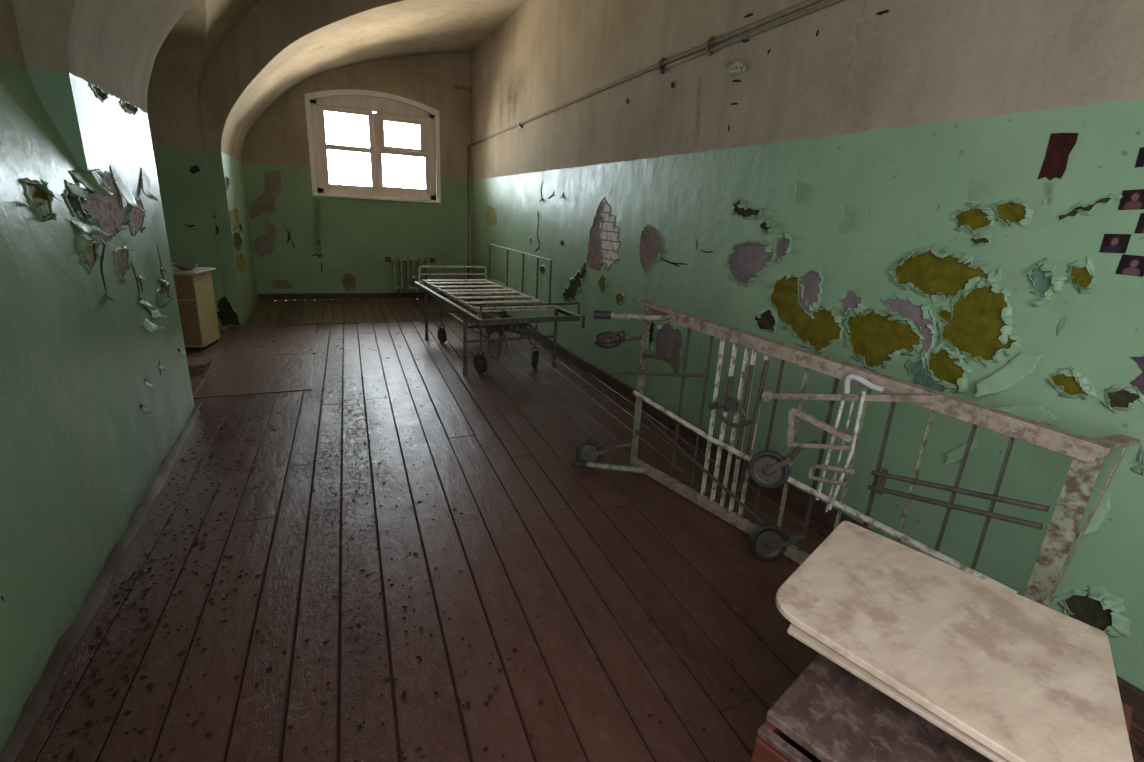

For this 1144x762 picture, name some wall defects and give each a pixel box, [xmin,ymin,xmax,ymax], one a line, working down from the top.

flaking render [19,165,158,284]
spalling [229,170,282,252]
flaking render [562,197,625,306]
spalling [639,224,665,276]
peeling [1056,193,1123,222]
peeling [137,279,176,333]
peeling [723,198,1144,425]
peeling [1049,585,1131,638]